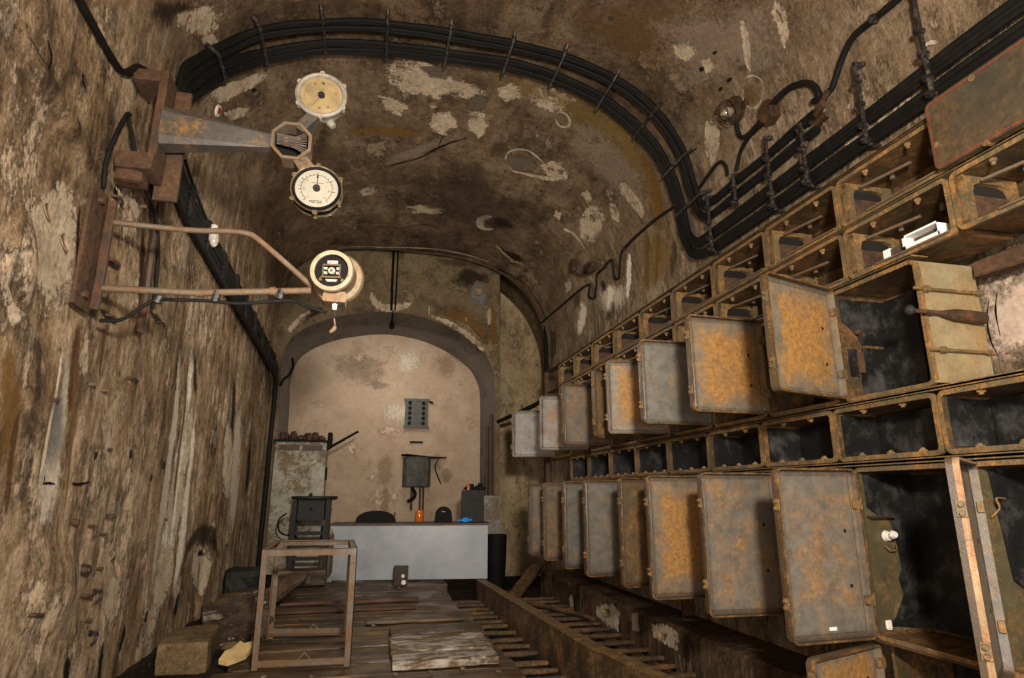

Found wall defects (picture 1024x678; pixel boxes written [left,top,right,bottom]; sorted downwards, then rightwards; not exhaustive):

peeling [673,41,717,74]
peeling [740,20,751,71]
peeling [771,1,789,48]
peeling [378,59,576,139]
crack [386,132,467,167]
peeling [704,121,720,166]
peeling [554,183,645,251]
peeling [27,180,77,316]
peeling [3,227,24,326]
rust [1,344,20,515]
peeling [596,604,679,651]